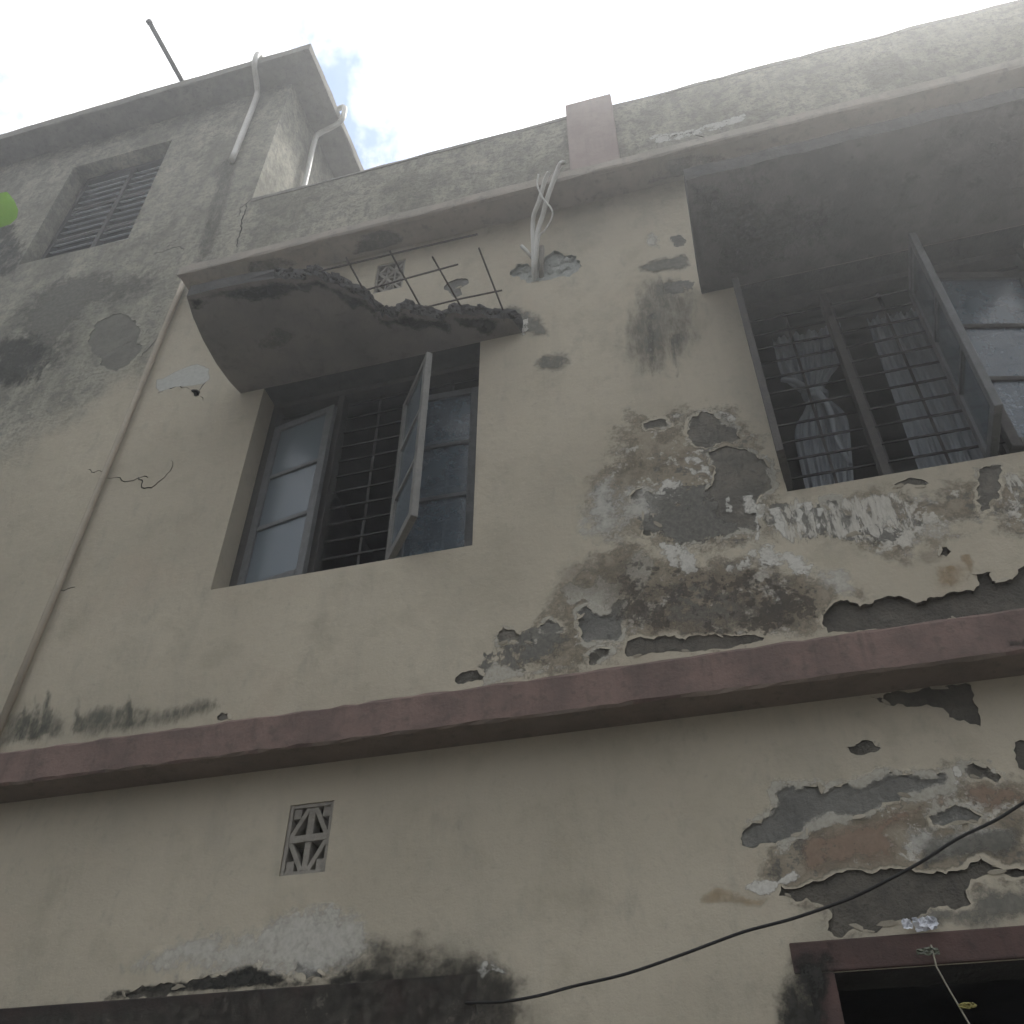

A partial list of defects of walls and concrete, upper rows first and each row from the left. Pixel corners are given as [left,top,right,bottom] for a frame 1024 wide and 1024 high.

crack [236,196,253,247]
water stain [0,273,151,388]
spalling [273,233,522,322]
water stain [632,235,695,364]
crack [88,461,173,489]
peeling [455,407,1024,684]
mould [74,703,208,732]
peeling [848,740,880,755]
peeling [874,683,981,726]
peeling [741,760,1024,938]
water stain [18,903,513,1024]
water stain [778,952,834,1024]